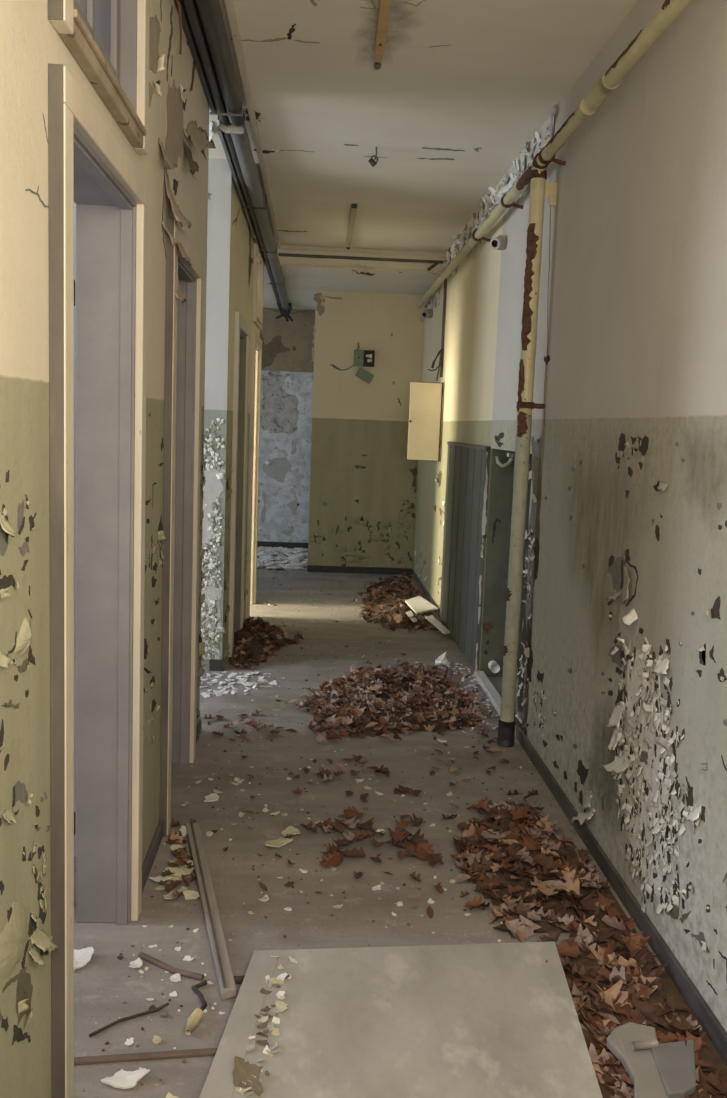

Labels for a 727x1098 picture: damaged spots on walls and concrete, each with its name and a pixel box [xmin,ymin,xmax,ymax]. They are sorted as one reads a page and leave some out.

peeling [480,432,504,558]
peeling [514,433,727,996]